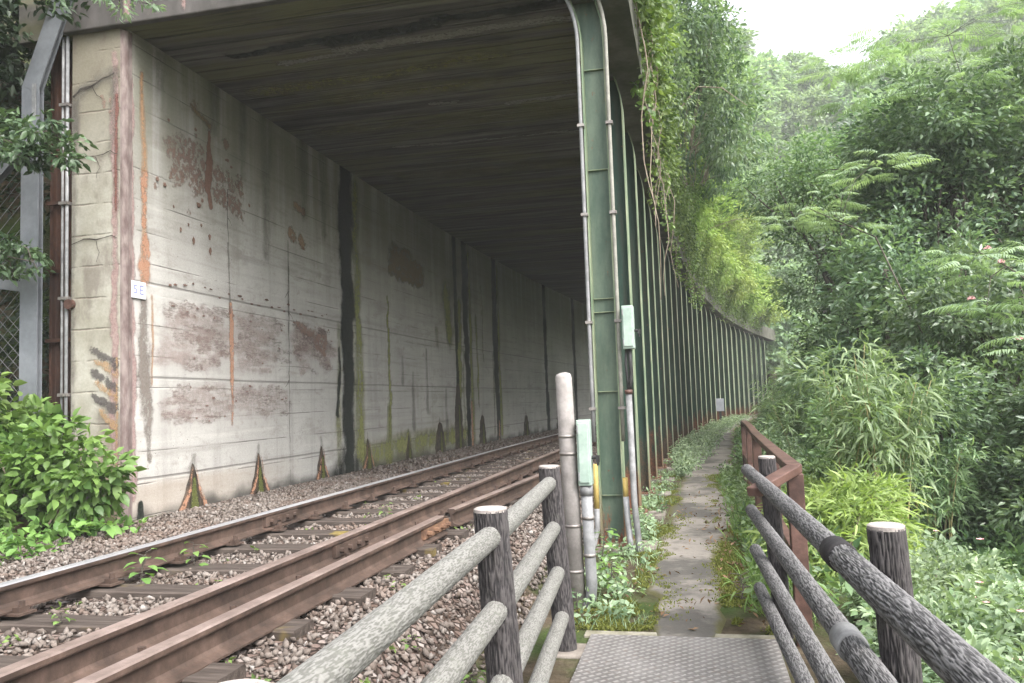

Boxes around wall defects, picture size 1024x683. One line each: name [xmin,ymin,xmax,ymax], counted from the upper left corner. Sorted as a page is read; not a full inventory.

crack [73,73,114,98]
crack [72,235,117,262]
rust [138,72,150,285]
spalling [154,100,250,255]
peeling [169,282,332,357]
water stain [334,166,503,476]